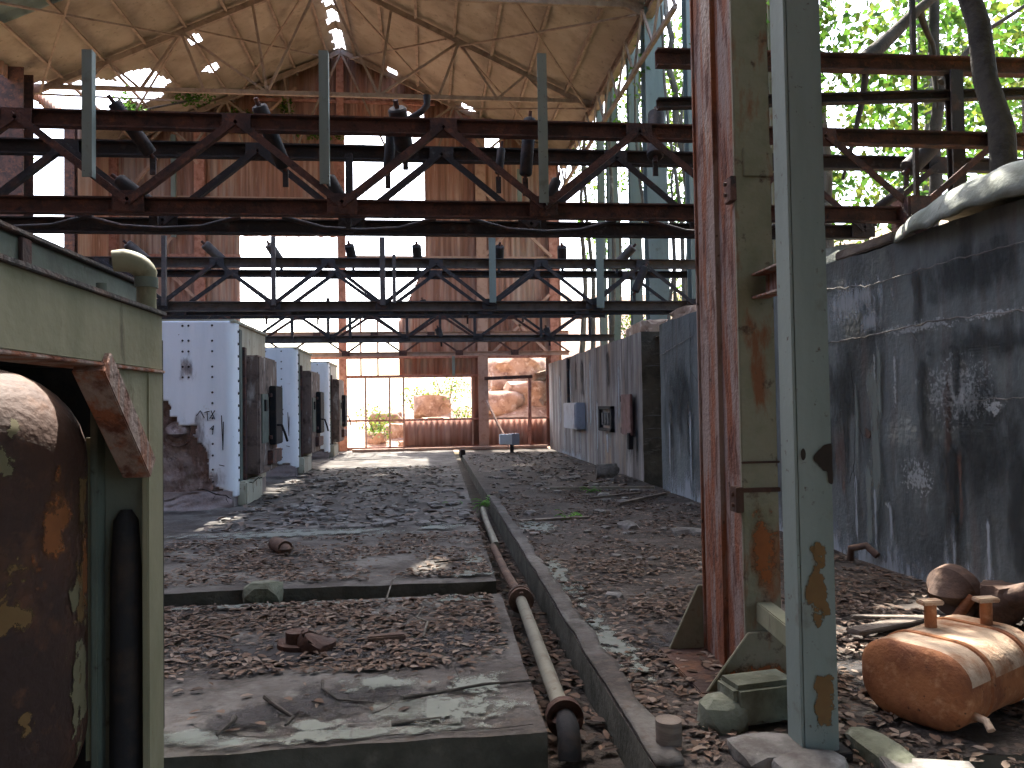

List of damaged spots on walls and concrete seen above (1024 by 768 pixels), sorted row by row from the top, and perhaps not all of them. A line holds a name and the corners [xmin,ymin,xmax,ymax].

damp [953,324,1024,396]
peeling [801,443,833,484]
damp [829,349,928,582]
damp [939,382,1024,580]
peeling [805,542,831,628]
peeling [813,674,835,727]